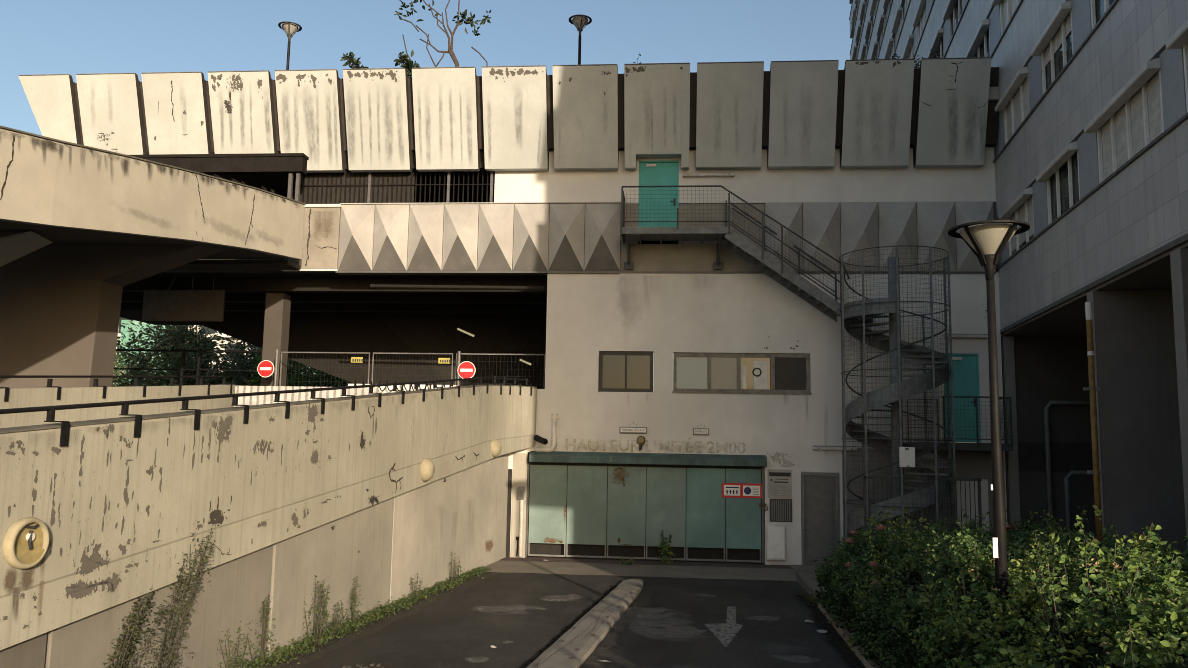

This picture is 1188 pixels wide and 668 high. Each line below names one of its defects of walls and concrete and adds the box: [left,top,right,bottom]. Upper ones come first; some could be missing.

peeling [211,74,243,114]
peeling [275,70,334,89]
peeling [347,66,398,82]
peeling [489,65,543,82]
crack [0,135,15,200]
crack [245,195,255,245]
peeling [146,417,170,492]
peeling [183,413,233,470]
peeling [297,403,332,468]
crack [389,463,403,493]
spalling [32,424,150,599]
spalling [197,496,232,545]